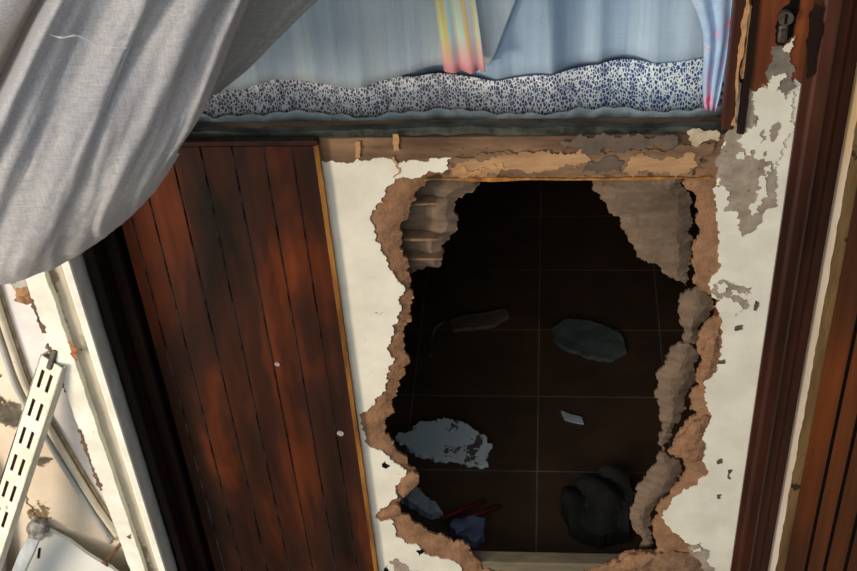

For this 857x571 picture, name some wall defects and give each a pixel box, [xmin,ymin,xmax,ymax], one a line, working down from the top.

peeling [712,36,799,237]
peeling [714,282,759,331]
peeling [384,558,410,571]
peeling [687,542,714,571]